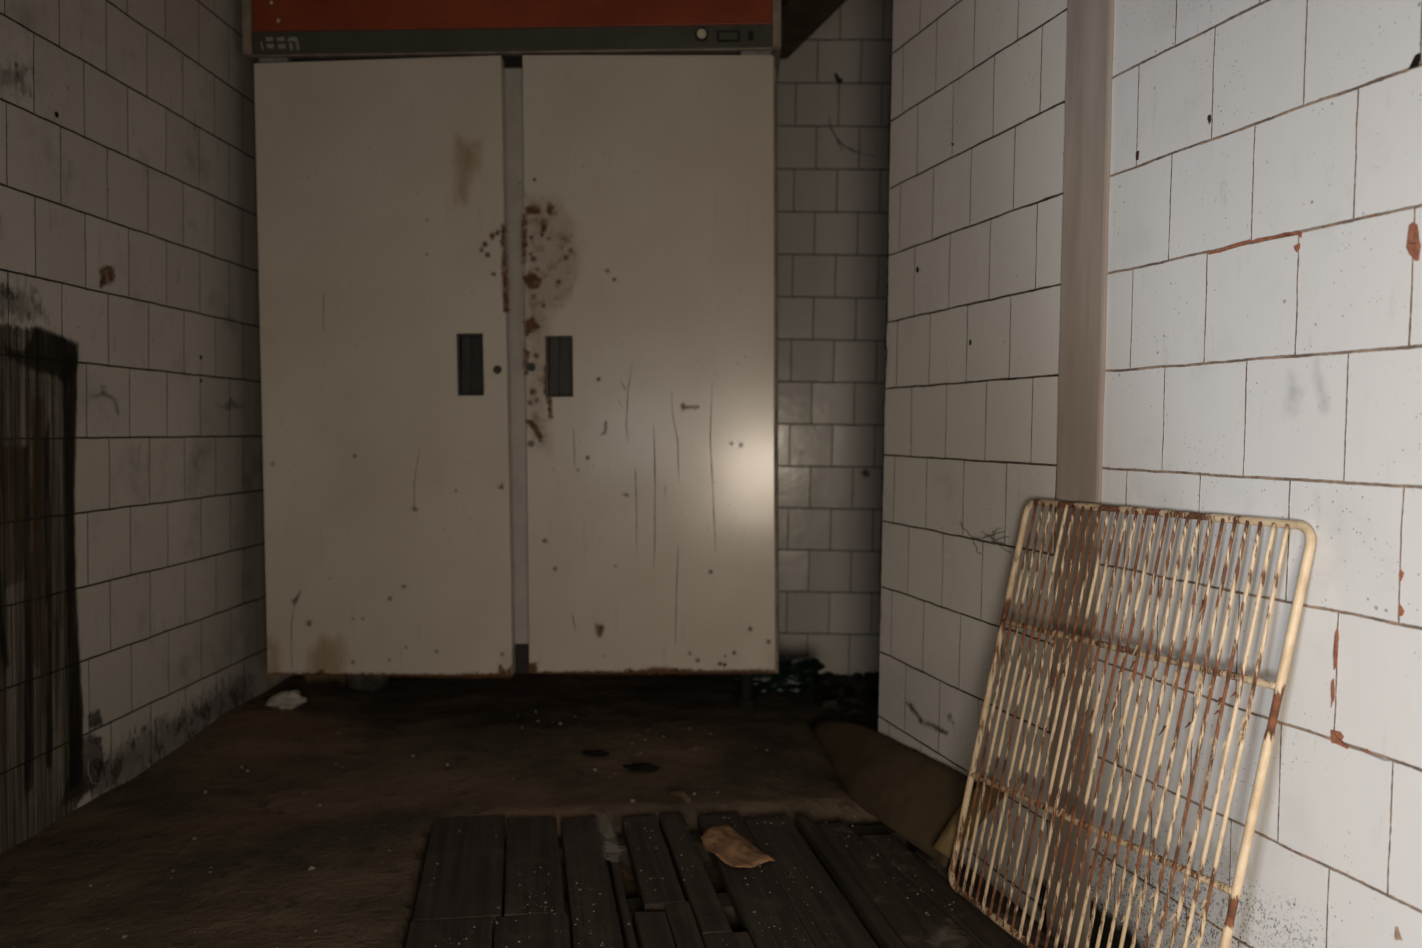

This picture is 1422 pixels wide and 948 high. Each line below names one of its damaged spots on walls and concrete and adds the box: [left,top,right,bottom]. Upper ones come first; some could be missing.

rust [480,204,554,446]
spalling [1406,222,1421,261]
leakage [0,324,103,854]